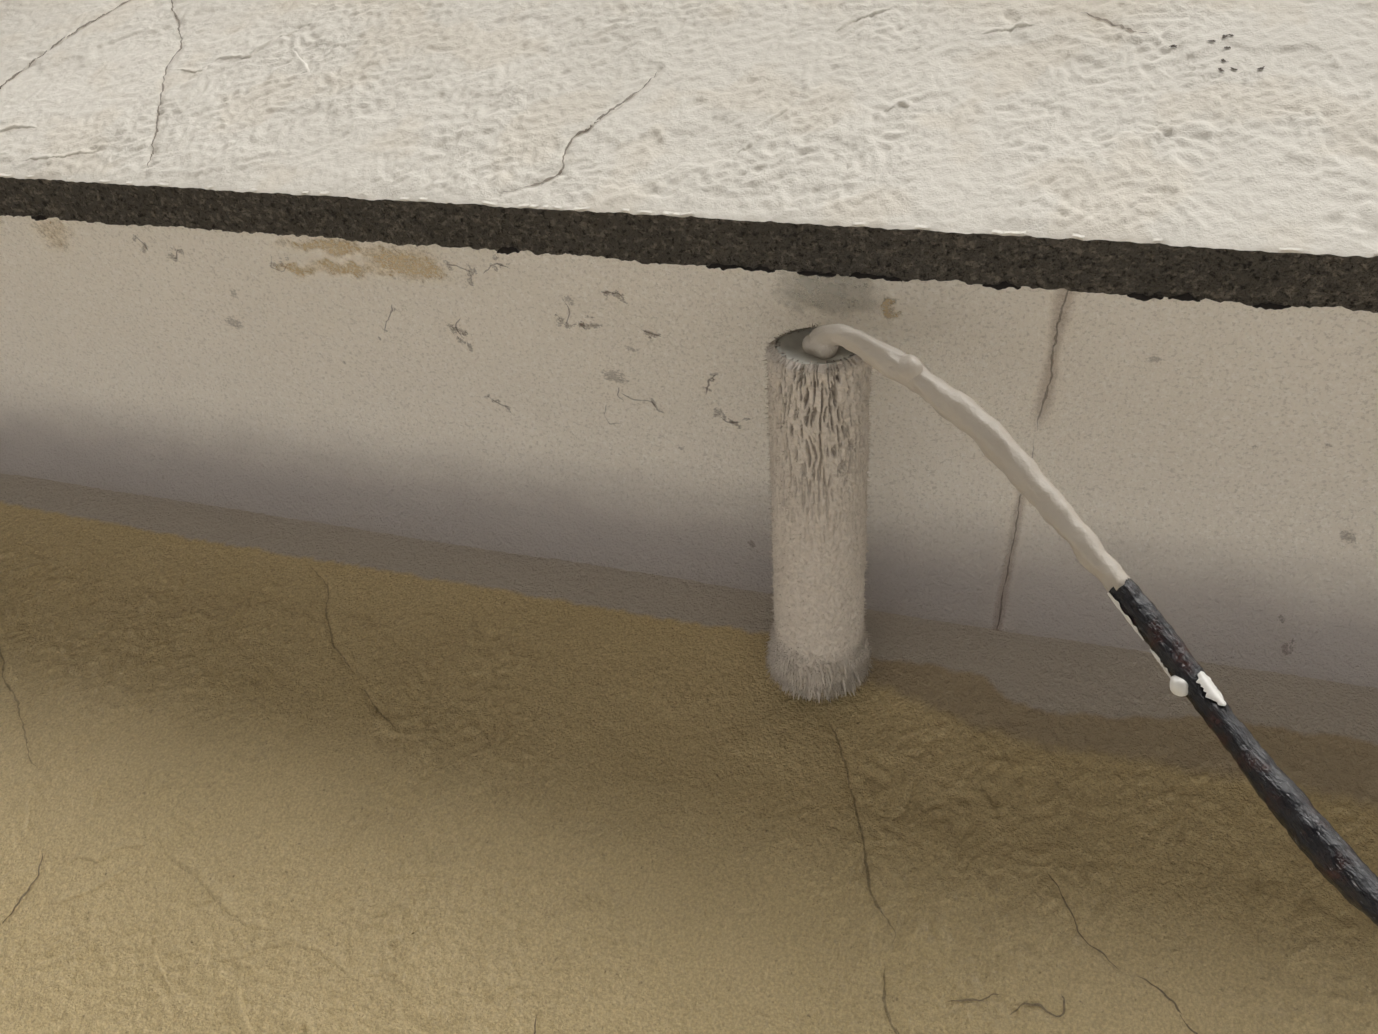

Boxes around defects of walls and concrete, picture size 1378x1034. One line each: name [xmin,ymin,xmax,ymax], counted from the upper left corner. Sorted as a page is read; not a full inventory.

crack [0,0,134,89]
crack [147,0,183,168]
crack [1087,13,1147,33]
crack [498,74,656,196]
crack [0,855,43,929]
crack [875,972,899,1034]